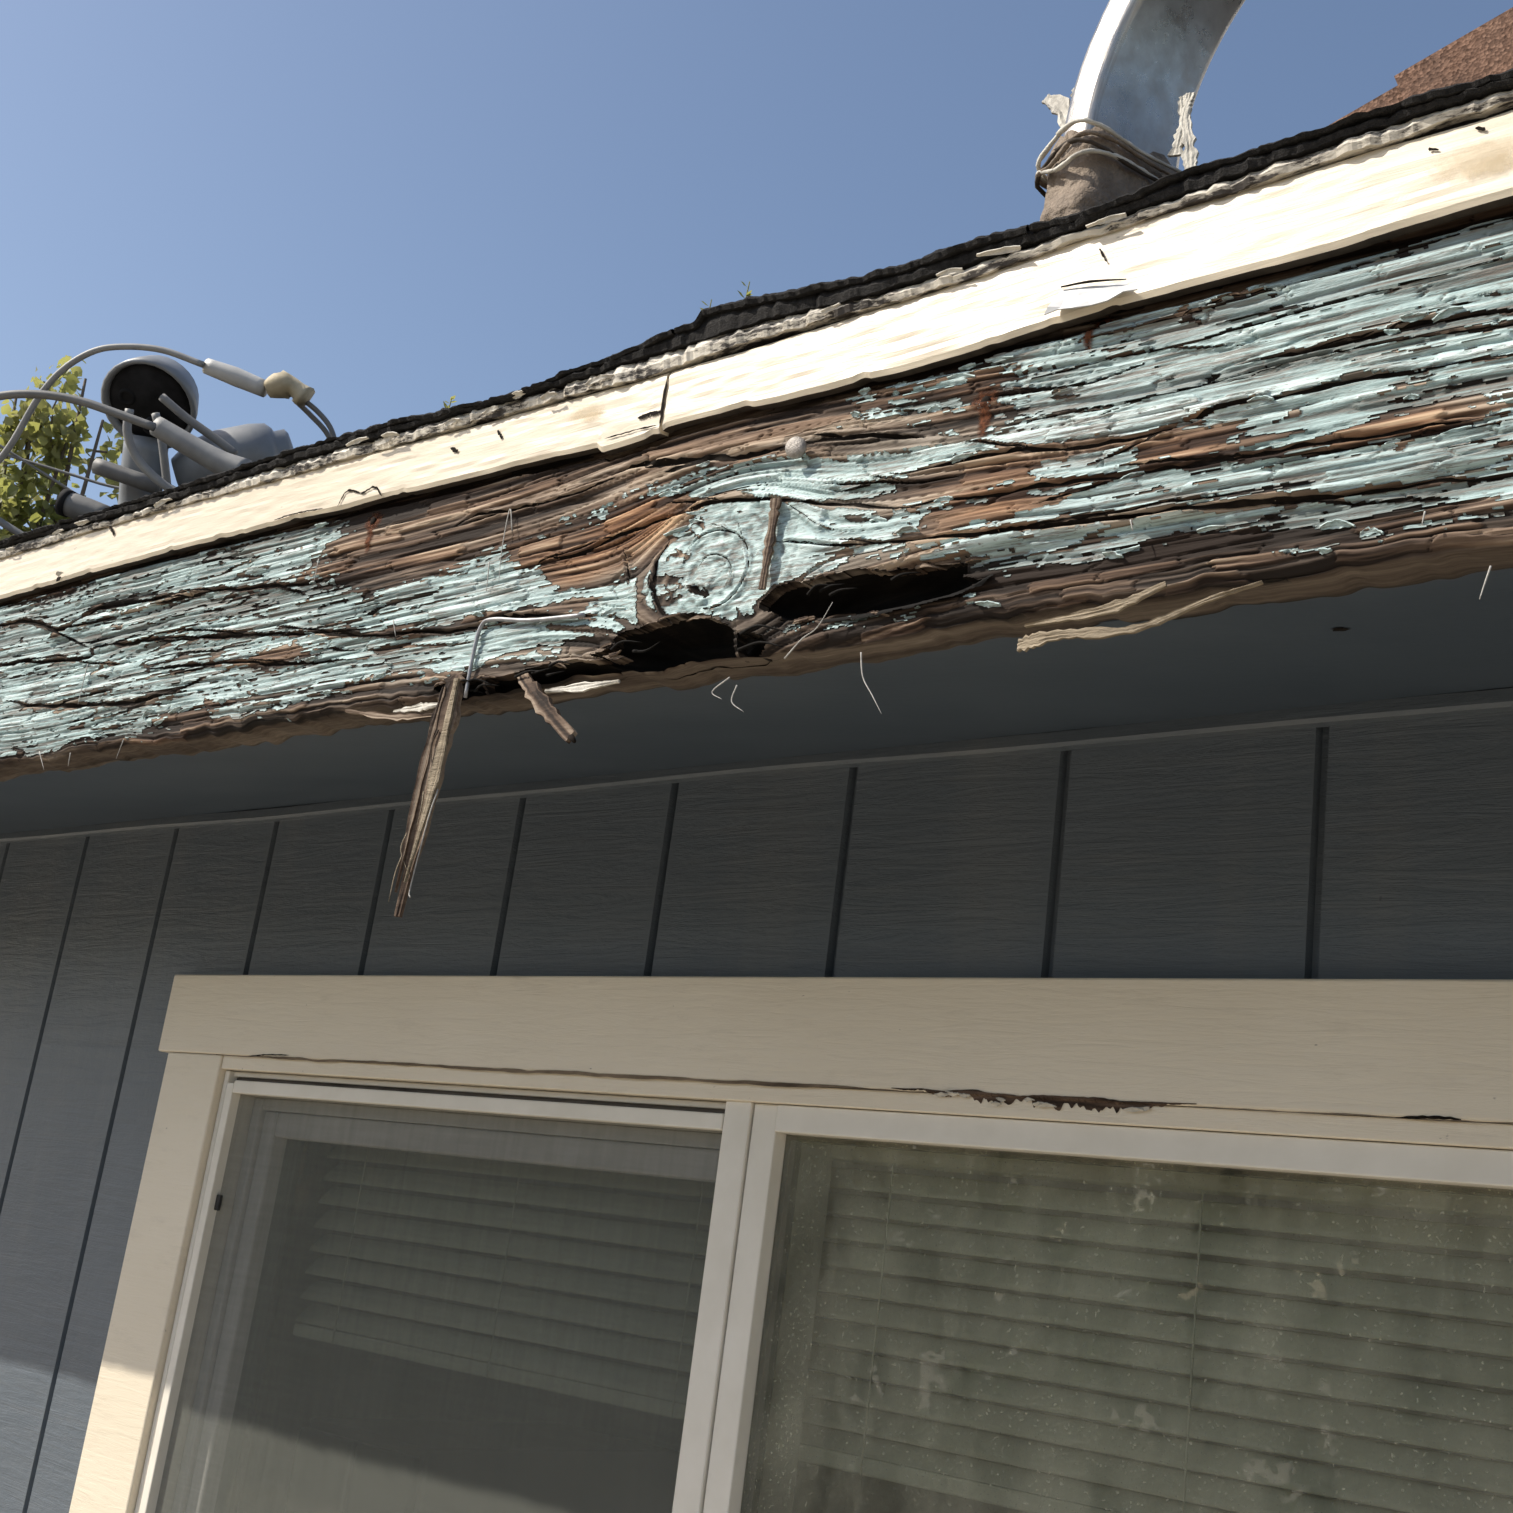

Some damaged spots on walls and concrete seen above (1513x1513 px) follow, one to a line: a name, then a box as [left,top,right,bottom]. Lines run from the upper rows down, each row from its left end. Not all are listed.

peeling [1044,279,1137,315]
peeling [1276,302,1484,357]
peeling [1313,388,1513,456]
peeling [293,350,1302,594]
peeling [960,472,1513,610]
peeling [131,629,335,744]
peeling [289,588,646,722]
crack [216,1054,924,1093]
crack [1188,1106,1513,1123]